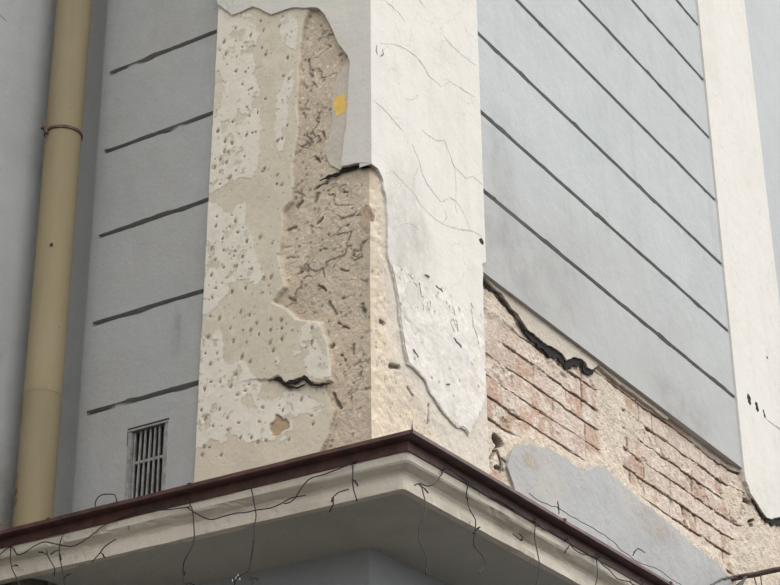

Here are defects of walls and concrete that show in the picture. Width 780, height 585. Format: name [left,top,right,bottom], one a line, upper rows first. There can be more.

spalling [194,5,780,585]
crack [483,279,596,376]
crack [268,375,330,389]
crack [751,498,780,527]